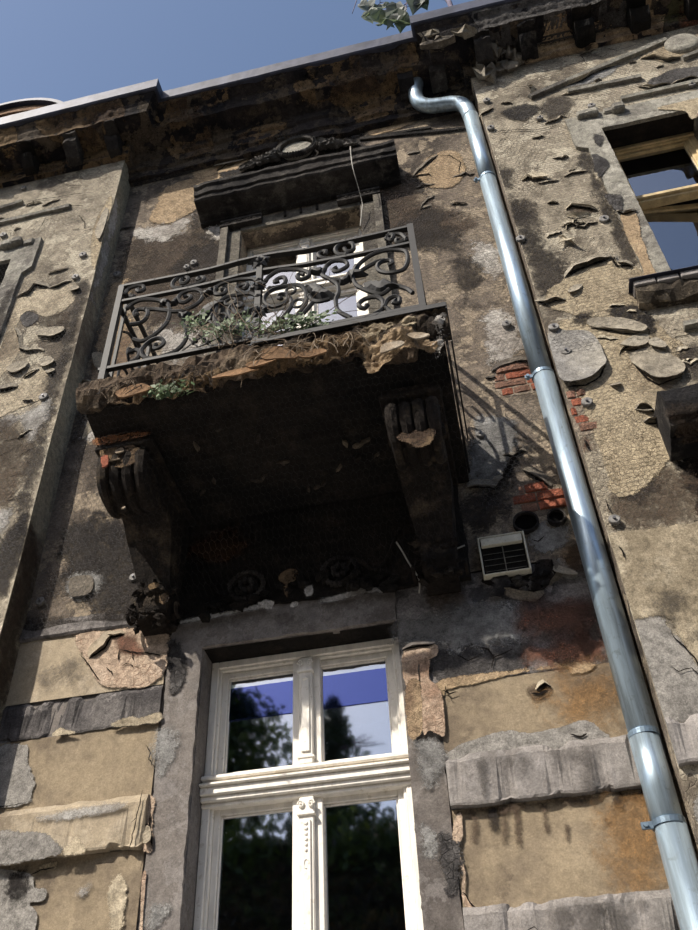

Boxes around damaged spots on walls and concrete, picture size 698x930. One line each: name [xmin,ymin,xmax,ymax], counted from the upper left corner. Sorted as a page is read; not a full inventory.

flaking render [0,126,71,189]
flaking render [33,98,130,179]
flaking render [155,87,229,160]
flaking render [0,268,79,417]
flaking render [484,356,536,396]
flaking render [535,208,698,497]
peeling [390,467,596,740]
flaking render [75,627,171,689]
crack [129,790,143,848]
leakage [453,747,593,846]